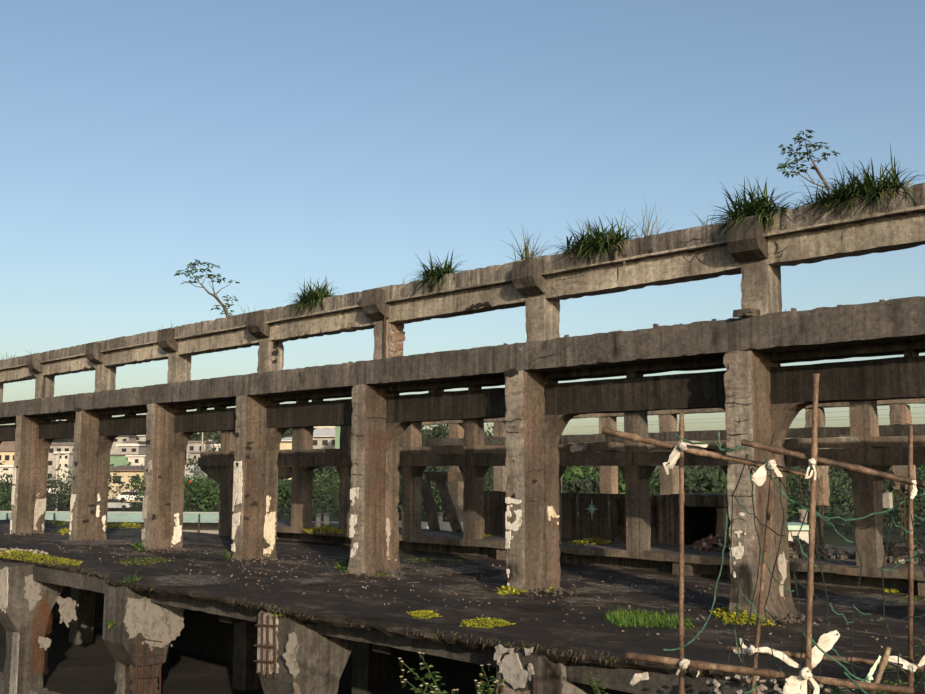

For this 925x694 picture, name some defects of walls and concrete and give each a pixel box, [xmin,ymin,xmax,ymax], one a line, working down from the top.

peeling [141,487,156,540]
peeling [165,503,182,547]
peeling [231,432,276,556]
peeling [349,487,359,558]
peeling [505,493,522,549]
peeling [0,567,9,613]
peeling [23,574,42,612]
peeling [56,596,79,628]
peeling [38,636,51,651]
peeling [123,597,185,694]
spalling [253,611,300,694]
peeling [494,644,536,694]